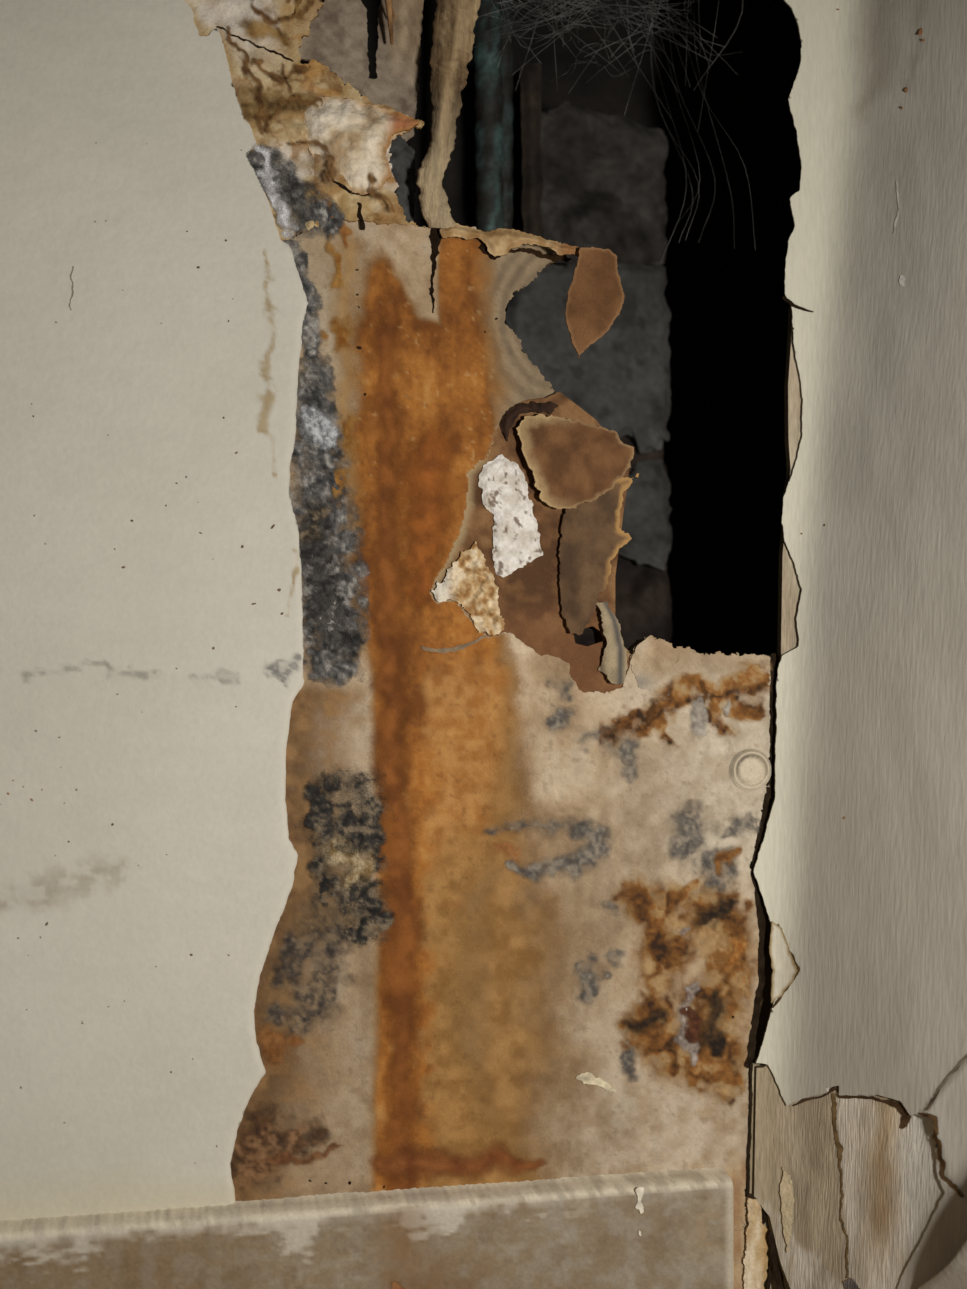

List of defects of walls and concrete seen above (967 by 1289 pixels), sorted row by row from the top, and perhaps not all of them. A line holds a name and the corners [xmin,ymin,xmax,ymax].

crack [217,26,294,62]
damp [227,0,369,686]
spalling [184,0,441,509]
peeling [466,239,568,476]
peeling [782,307,802,506]
corrosion [327,200,550,1192]
damp [582,663,771,780]
peeling [230,574,385,1201]
damp [258,769,394,1066]
damp [609,803,759,1104]
peeling [432,524,944,1289]
crack [793,1055,967,1278]